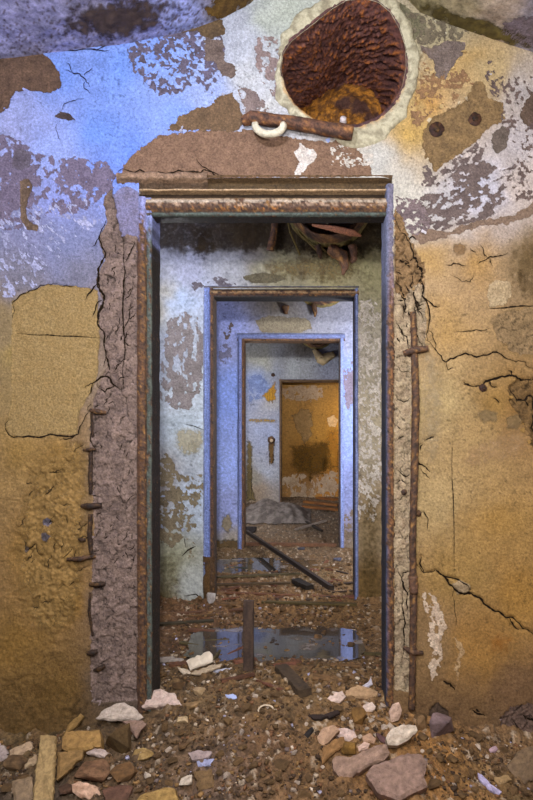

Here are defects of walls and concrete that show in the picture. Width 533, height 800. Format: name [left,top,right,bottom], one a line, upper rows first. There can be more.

crack [5,221,137,501]
spalling [0,0,374,706]
spalling [393,3,533,692]
crack [396,221,533,431]
crack [19,470,135,586]
water stain [282,441,339,498]
water stain [422,592,447,681]
crack [398,557,533,657]